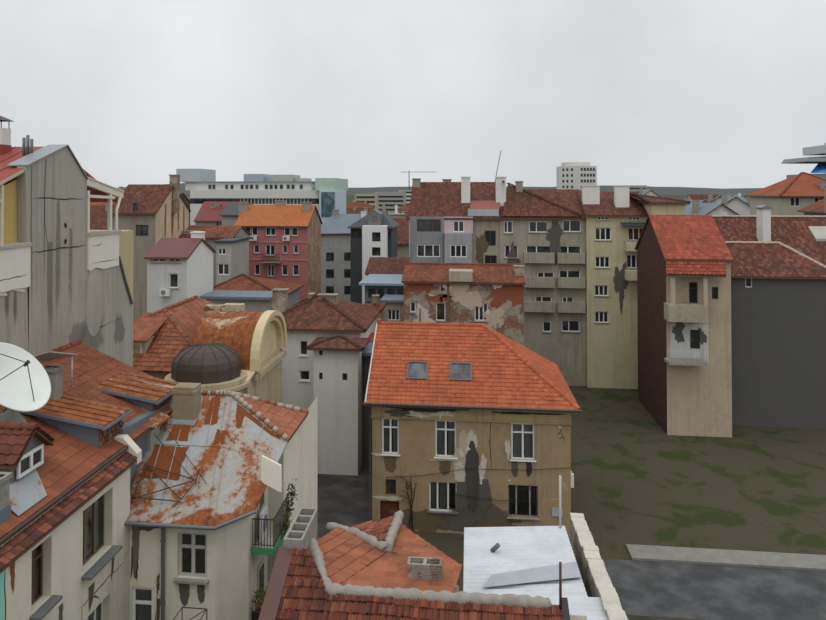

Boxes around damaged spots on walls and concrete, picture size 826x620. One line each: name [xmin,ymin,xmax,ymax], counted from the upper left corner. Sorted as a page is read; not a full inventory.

crack [31,197,116,263]
peeling [403,279,526,328]
corrosion [204,397,225,444]
corrosion [235,404,280,439]
corrosion [142,424,190,480]
peeling [429,429,487,491]